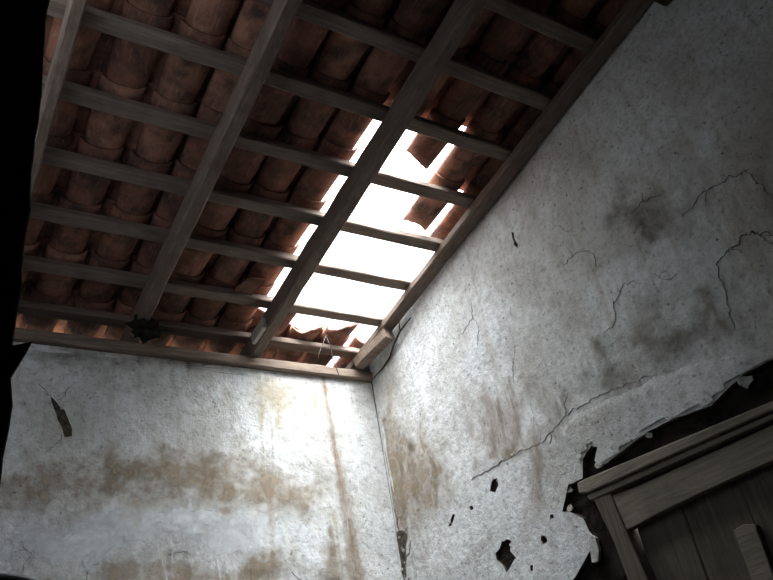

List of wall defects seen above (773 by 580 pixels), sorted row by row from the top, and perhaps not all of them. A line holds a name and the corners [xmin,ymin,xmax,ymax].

crack [683,170,772,215]
crack [716,230,773,328]
spalling [49,394,71,437]
crack [472,376,646,479]
flaking render [586,362,773,478]
damp [103,447,241,526]
damp [383,417,447,534]
damp [107,553,281,580]
damp [327,528,339,579]
damp [344,518,361,580]
spalling [498,539,516,571]
flaking render [567,483,628,580]